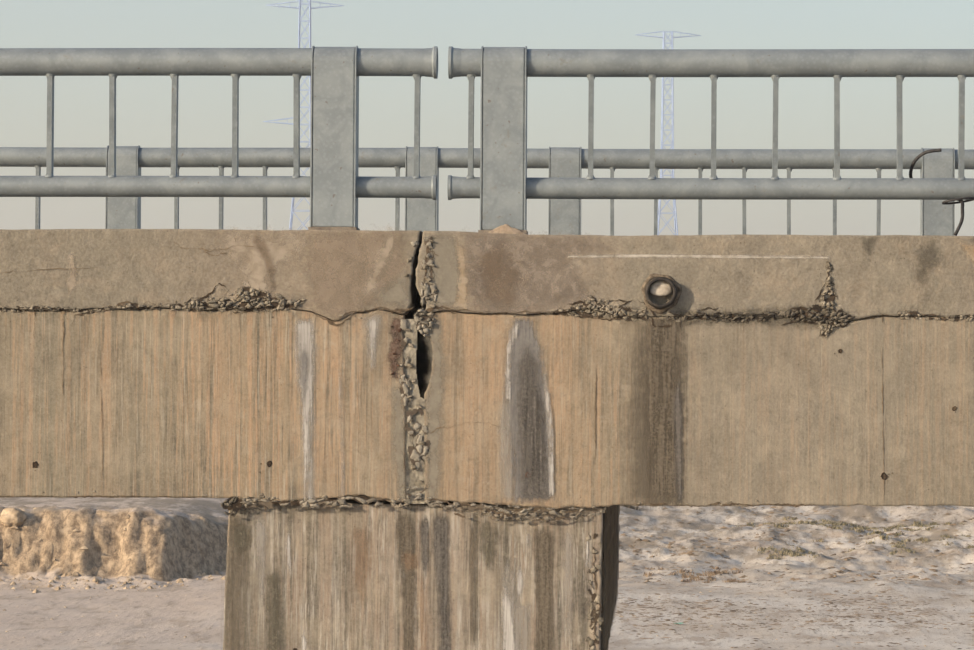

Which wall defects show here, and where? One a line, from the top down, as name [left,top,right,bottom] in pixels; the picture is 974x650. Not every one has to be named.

crack [8,280,295,389]
peeling [0,233,306,314]
spalling [221,236,606,522]
crack [316,290,644,326]
damp [500,319,554,500]
damp [631,318,685,503]
spalling [545,261,855,338]
spalling [897,311,974,321]
spalling [0,490,212,498]
damp [396,514,451,650]
damp [503,528,554,650]
damp [602,505,620,650]